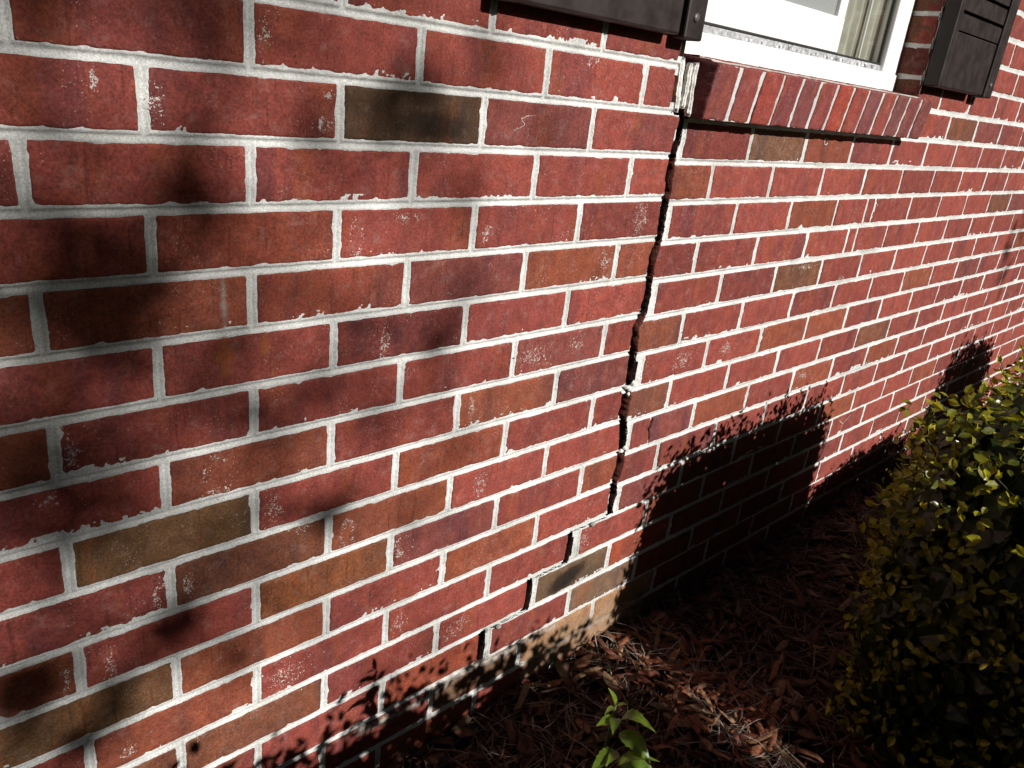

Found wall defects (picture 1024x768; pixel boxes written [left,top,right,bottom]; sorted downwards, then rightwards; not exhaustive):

crack [476,112,689,663]